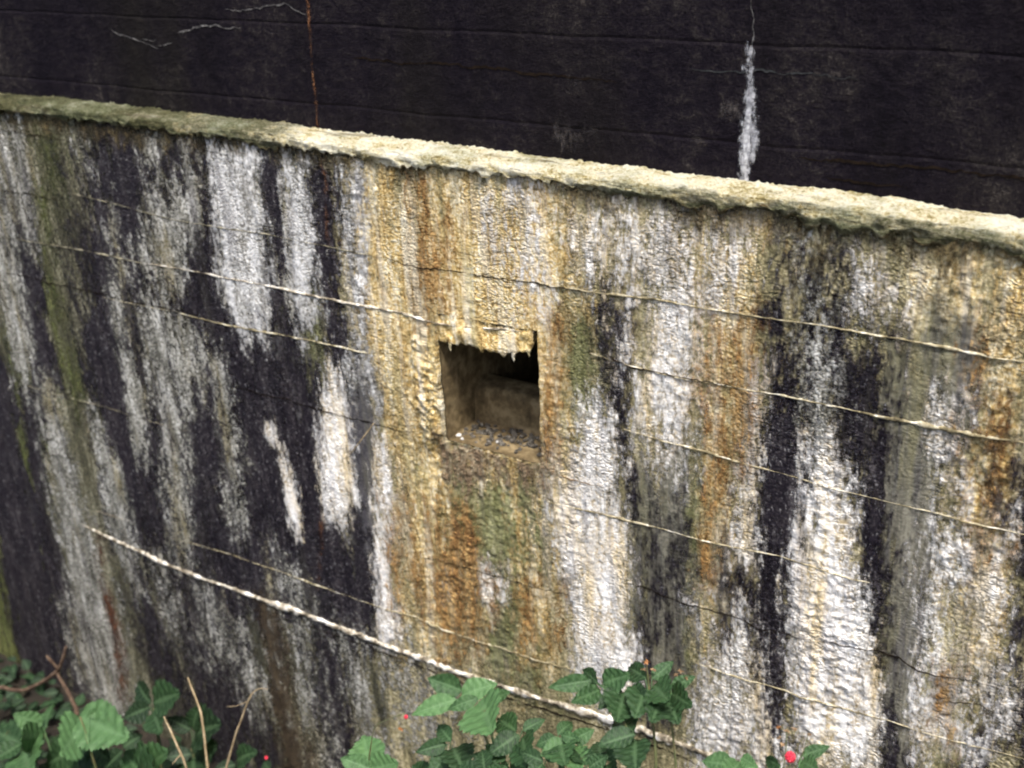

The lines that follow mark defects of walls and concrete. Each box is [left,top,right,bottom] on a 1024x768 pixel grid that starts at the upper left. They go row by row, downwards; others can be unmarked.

crack [112,2,303,49]
leakage [739,46,759,181]
corrosion [403,167,455,337]
leakage [0,111,345,768]
leakage [313,152,1024,768]
corrosion [693,308,761,590]
corrosion [379,470,502,675]
corrosion [514,563,569,672]
crack [626,583,1019,713]